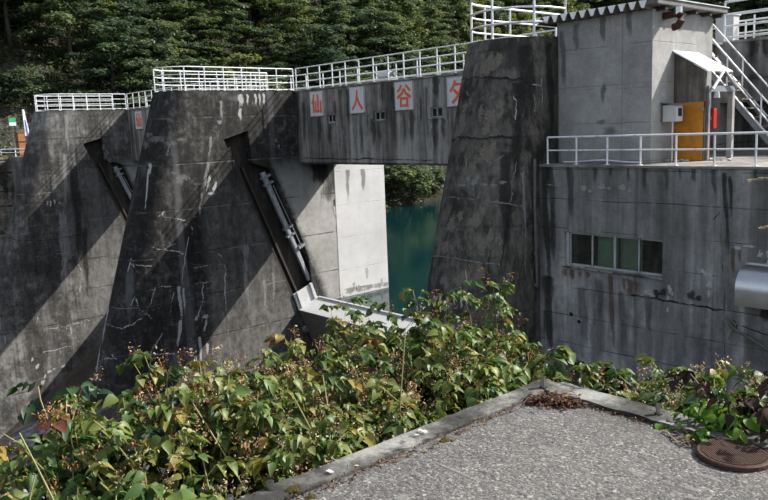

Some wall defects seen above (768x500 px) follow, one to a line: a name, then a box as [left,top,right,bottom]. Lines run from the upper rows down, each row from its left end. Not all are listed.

leakage [237,93,265,119]
leakage [47,114,88,293]
leakage [199,137,217,212]
crack [432,75,543,265]
leakage [719,173,746,238]
crack [36,211,233,371]
leakage [176,286,186,345]
leakage [194,314,209,361]
leakage [542,167,556,341]
crack [631,292,768,351]